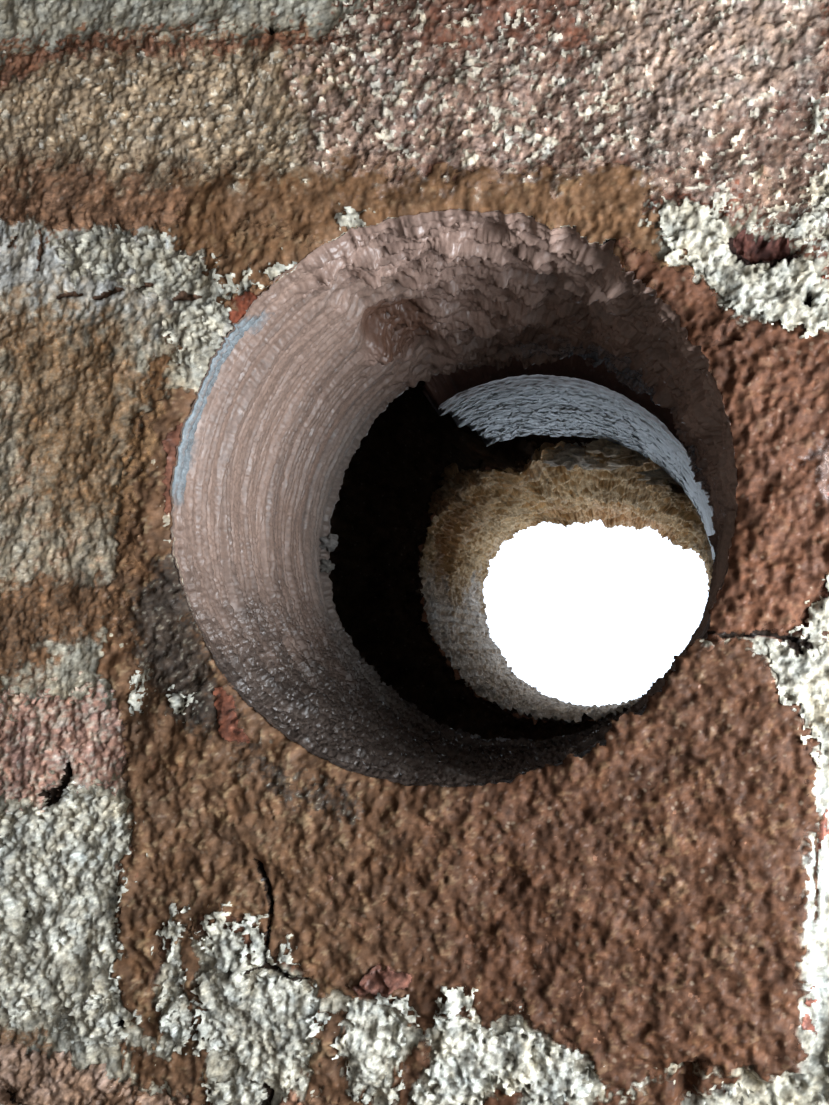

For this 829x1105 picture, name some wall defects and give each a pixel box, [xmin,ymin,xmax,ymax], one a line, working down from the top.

peeling [790,52,829,145]
peeling [334,203,376,231]
peeling [645,150,829,339]
peeling [53,224,297,378]
spalling [162,422,183,515]
crack [707,629,814,655]
peeling [756,575,829,769]
crack [242,858,309,982]
peeling [0,670,596,1105]
crack [813,821,821,921]
spalling [817,809,829,851]
spalling [801,986,818,1035]